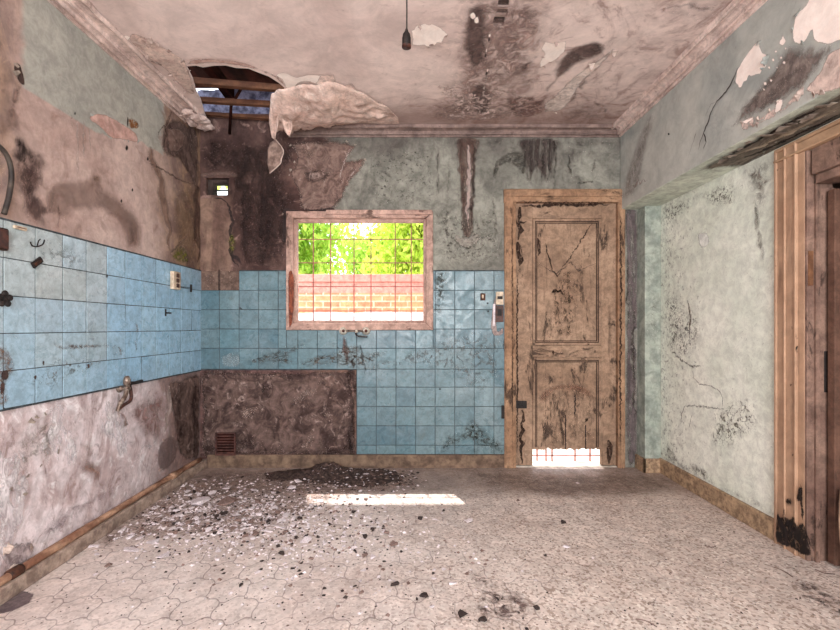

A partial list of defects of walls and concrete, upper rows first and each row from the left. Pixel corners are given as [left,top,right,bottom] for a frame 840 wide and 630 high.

damp [15,141,46,215]
peeling [90,114,139,144]
damp [208,142,291,262]
peeling [412,24,448,48]
damp [438,3,542,121]
damp [493,138,557,179]
peeling [540,42,566,68]
damp [557,43,602,77]
crack [694,68,738,149]
peeling [707,0,840,169]
flaking render [202,371,356,455]
damp [713,400,753,441]